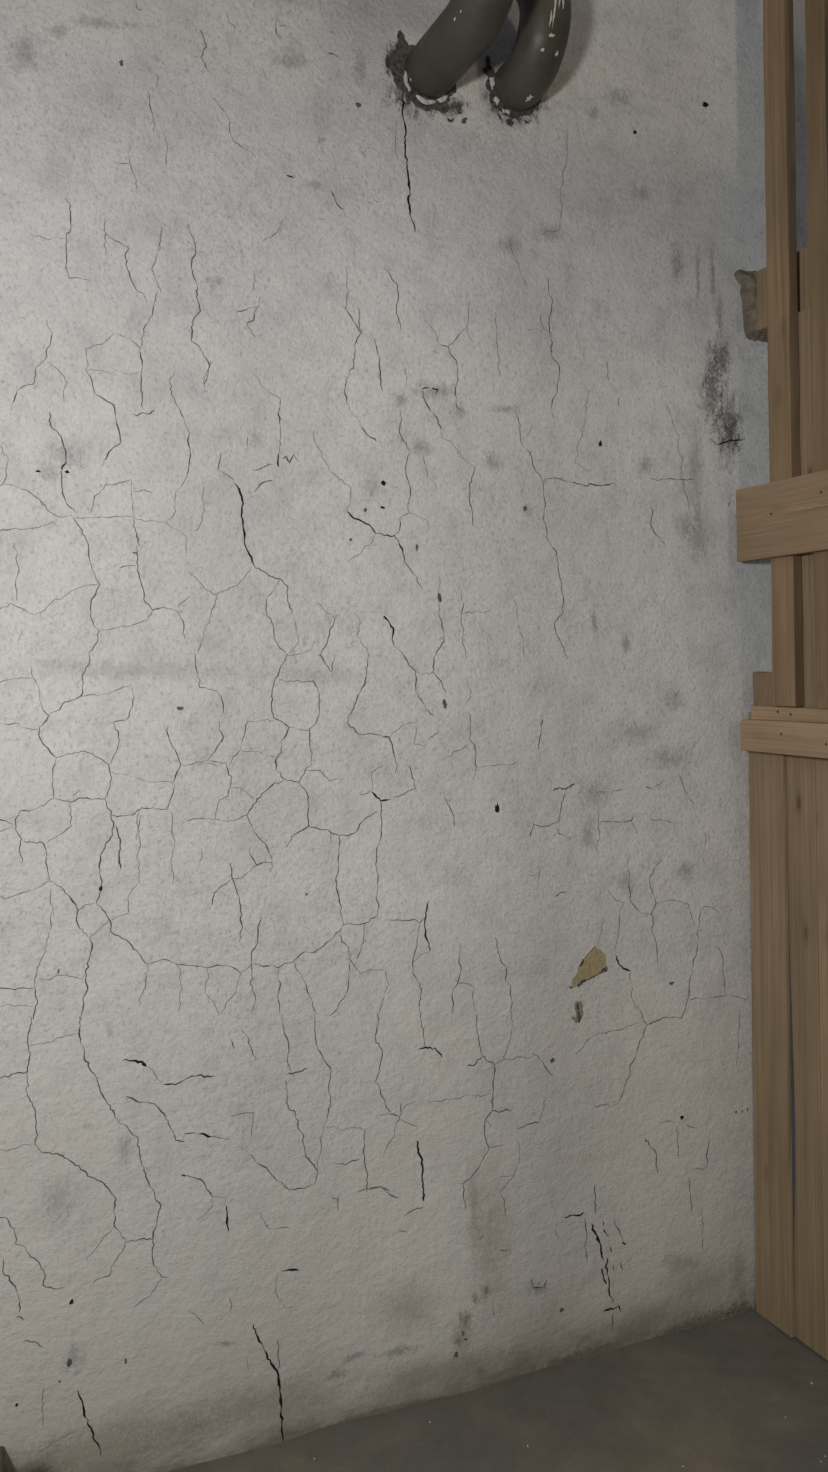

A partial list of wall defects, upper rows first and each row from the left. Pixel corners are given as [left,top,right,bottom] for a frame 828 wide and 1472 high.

crack [114,76,167,189]
crack [194,16,255,156]
crack [331,90,436,229]
crack [0,124,750,1348]
spalling [569,945,608,1023]
crack [40,1389,101,1455]
crack [188,1269,299,1441]